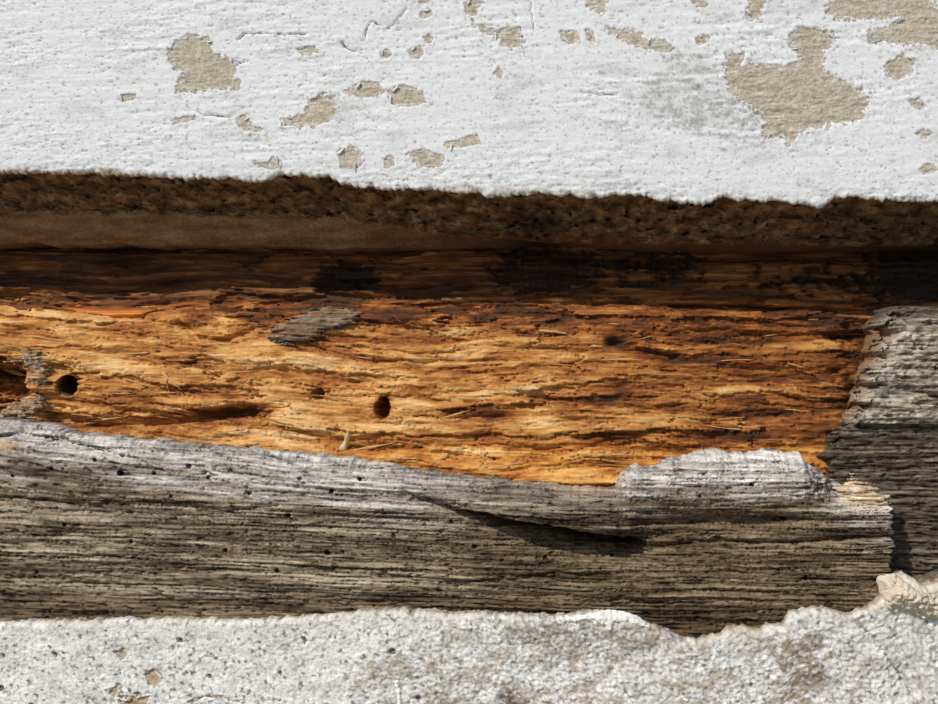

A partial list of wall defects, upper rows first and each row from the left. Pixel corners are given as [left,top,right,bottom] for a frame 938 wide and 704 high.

peeling [586,0,609,14]
peeling [744,0,767,21]
peeling [559,29,595,44]
peeling [825,0,938,80]
peeling [168,34,242,94]
peeling [344,81,427,107]
peeling [605,26,870,146]
peeling [280,92,339,129]
peeling [919,164,938,174]
flaking render [557,609,650,631]
flaking render [145,669,163,687]
flaking render [110,683,149,704]